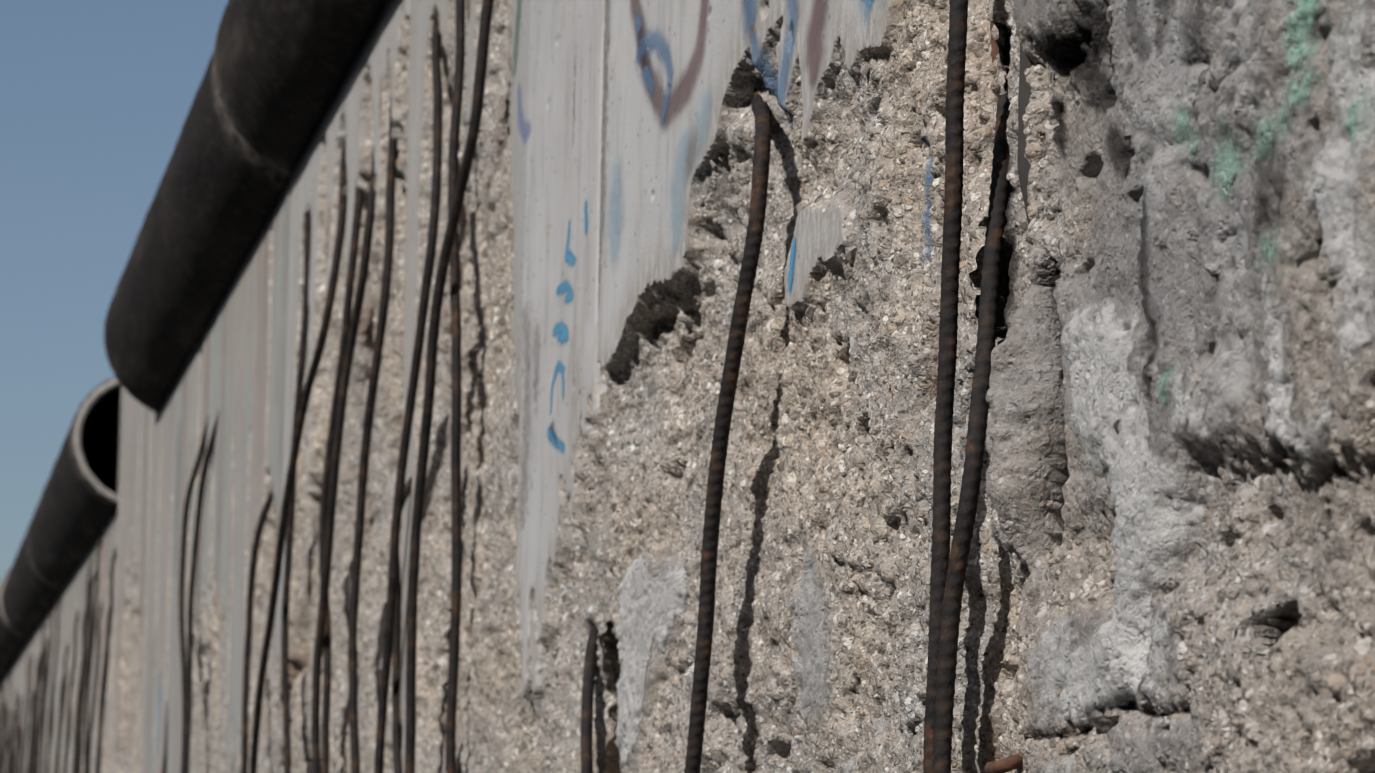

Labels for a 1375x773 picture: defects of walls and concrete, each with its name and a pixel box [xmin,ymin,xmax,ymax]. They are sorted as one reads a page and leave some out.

spalling [179,7,410,773]
spalling [374,0,1375,773]